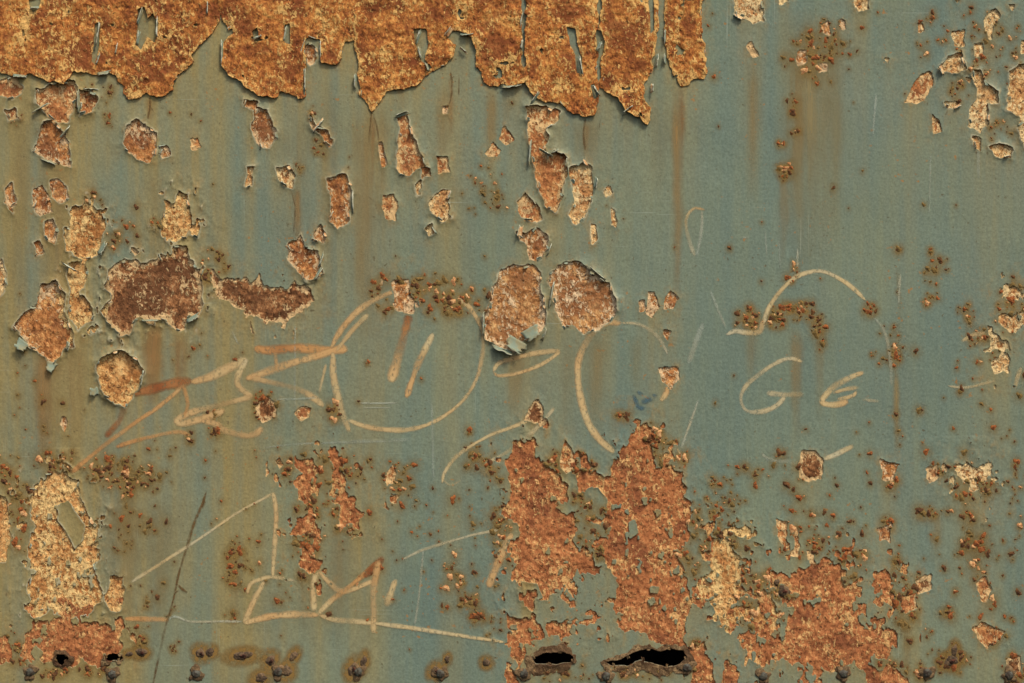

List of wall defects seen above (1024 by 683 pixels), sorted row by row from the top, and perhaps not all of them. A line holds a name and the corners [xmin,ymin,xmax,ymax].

peeling [0,76,23,121]
peeling [904,4,1024,159]
peeling [13,178,209,407]
peeling [482,105,618,355]
rust [734,300,829,350]
rust [922,247,949,307]
rust [957,275,1024,364]
peeling [0,454,126,617]
rust [410,399,1024,683]
peeling [697,512,781,633]
rust [0,597,151,681]
rust [191,643,302,683]